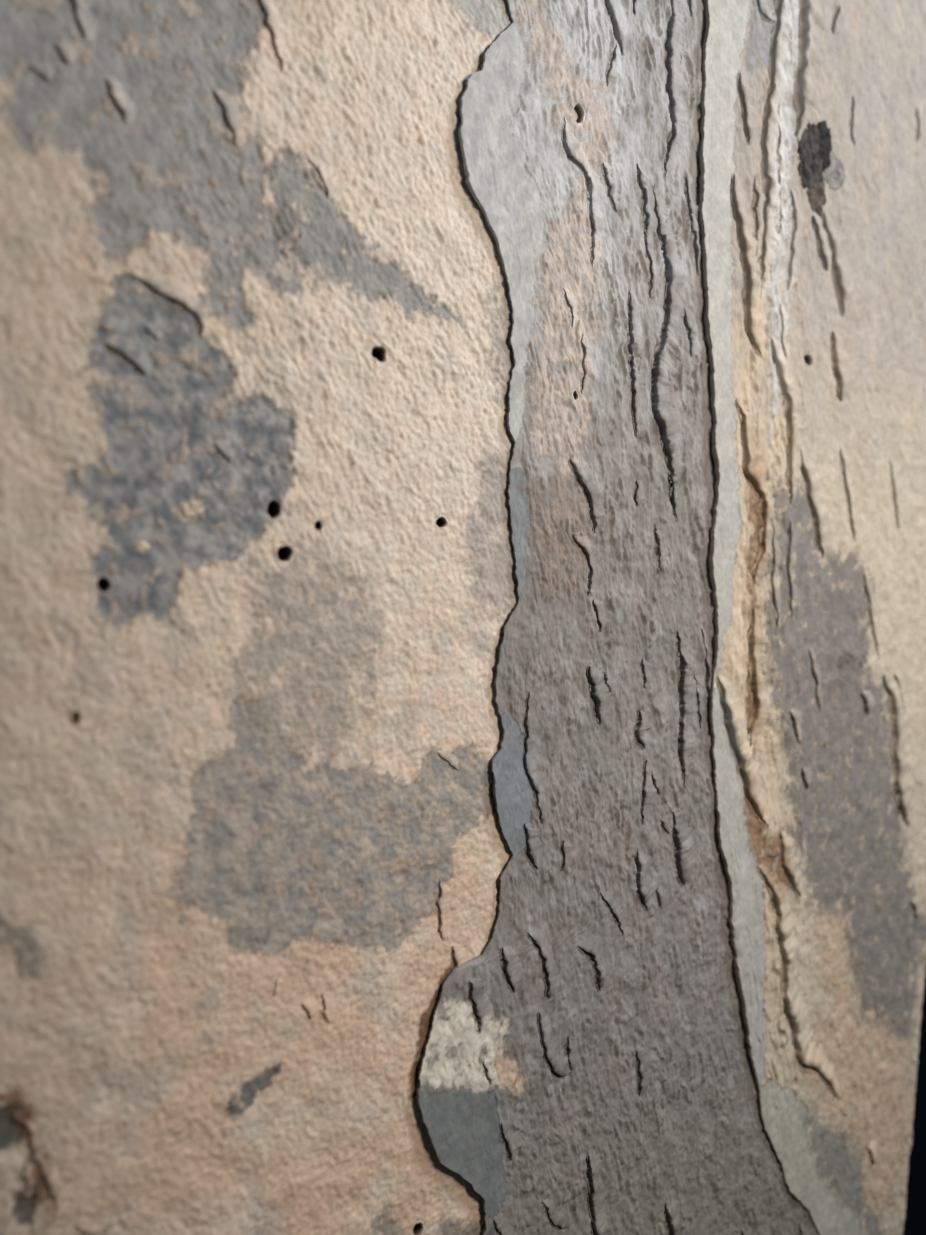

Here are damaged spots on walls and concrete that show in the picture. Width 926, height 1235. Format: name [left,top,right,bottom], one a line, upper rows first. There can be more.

crack [850,96,860,147]
crack [915,108,924,143]
crack [890,460,903,527]
crack [435,0,858,1101]
peeling [416,0,926,1235]
crack [861,570,912,827]
crack [911,895,921,920]
spalling [0,1104,23,1150]
crack [499,1120,521,1161]
crack [867,1140,878,1166]
spalling [11,1192,35,1226]
spalling [410,1220,425,1235]